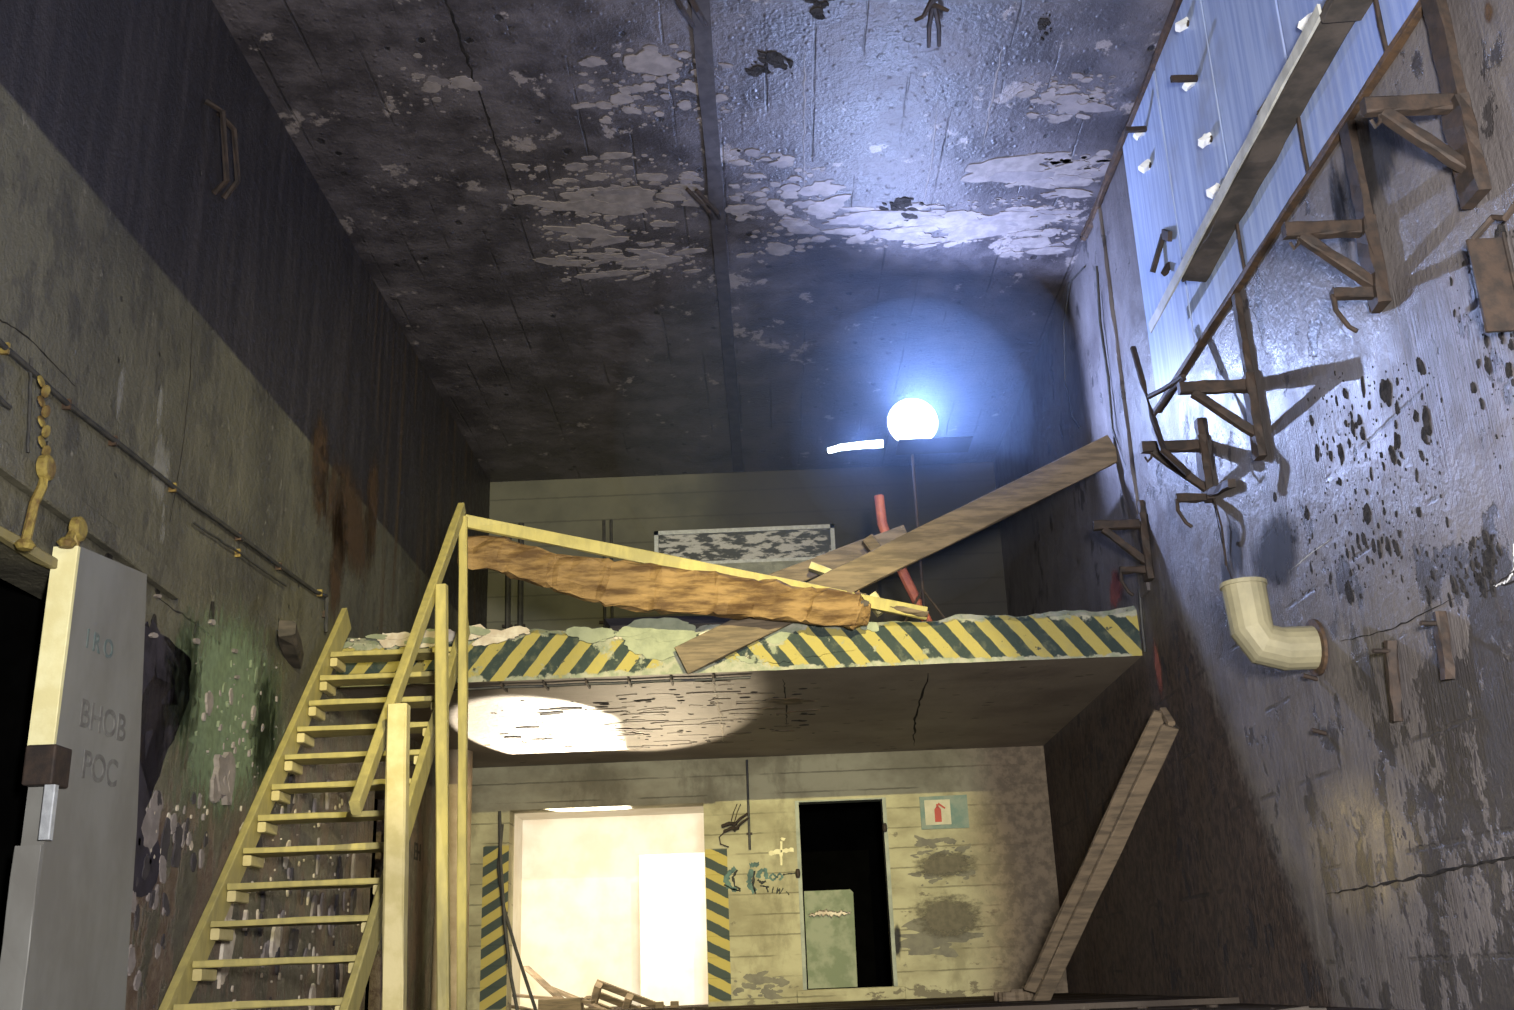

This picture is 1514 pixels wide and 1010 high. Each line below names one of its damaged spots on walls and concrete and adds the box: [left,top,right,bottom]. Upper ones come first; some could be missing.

peeling [571,44,730,131]
spalling [715,50,793,77]
peeling [1016,73,1116,123]
peeling [508,152,708,283]
peeling [725,148,1111,258]
crack [1342,544,1514,641]
flaking render [127,588,278,991]
peeling [217,773,357,1010]
water stain [919,853,974,876]
water stain [917,896,980,937]
crack [1327,856,1514,894]